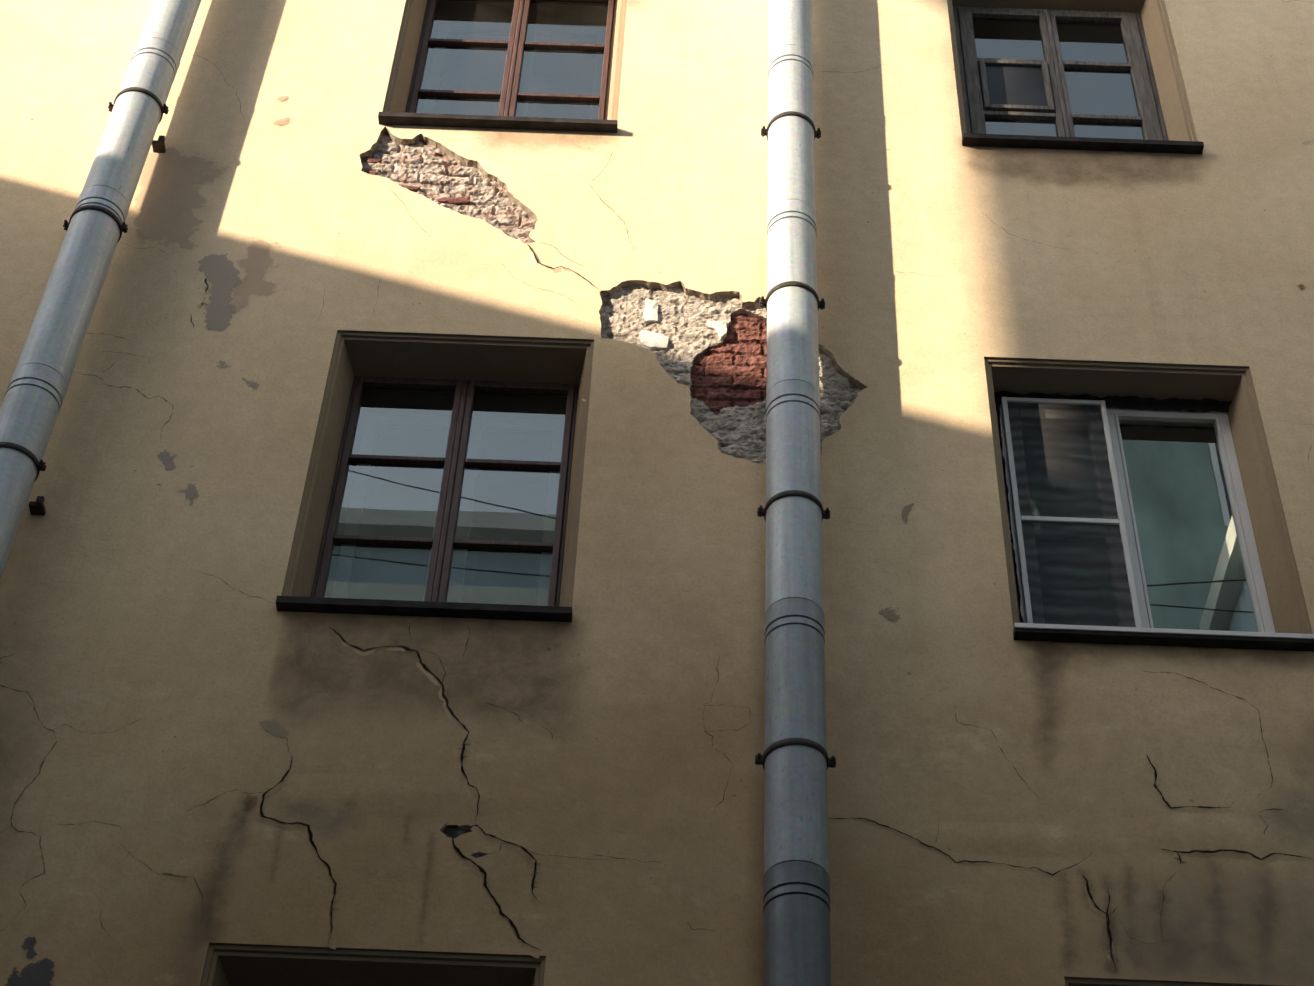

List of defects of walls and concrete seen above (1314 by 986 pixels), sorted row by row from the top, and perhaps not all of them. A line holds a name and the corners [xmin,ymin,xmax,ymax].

spalling [360,126,538,244]
peeling [199,254,242,331]
crack [503,241,598,306]
spalling [599,280,767,464]
spalling [818,344,867,454]
crack [188,742,342,950]
crack [331,626,666,959]
crack [831,671,1314,974]
peeling [5,937,54,986]